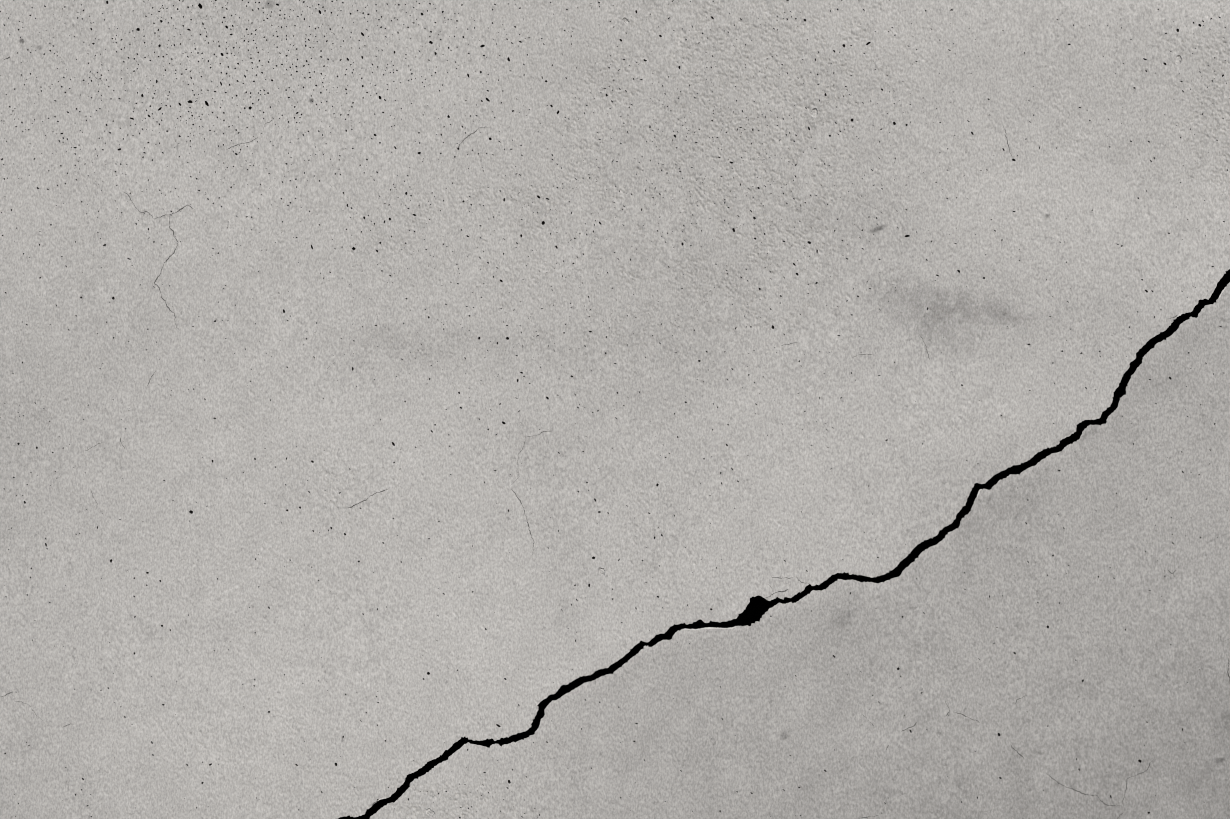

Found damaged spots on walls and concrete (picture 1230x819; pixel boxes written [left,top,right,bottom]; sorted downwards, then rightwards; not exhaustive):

crack [338,269,1230,819]